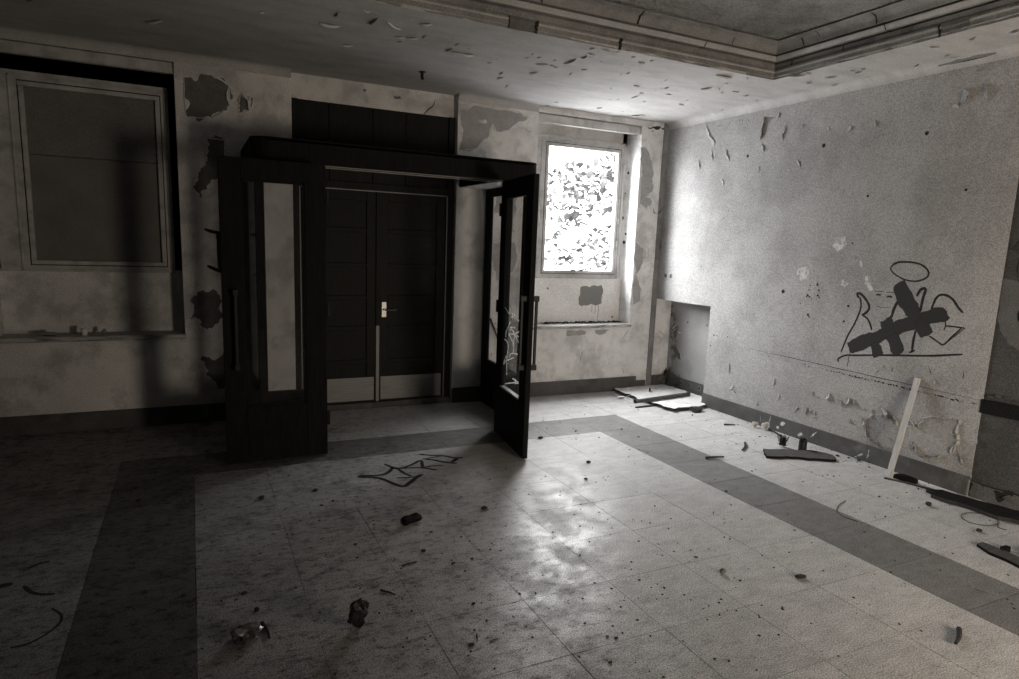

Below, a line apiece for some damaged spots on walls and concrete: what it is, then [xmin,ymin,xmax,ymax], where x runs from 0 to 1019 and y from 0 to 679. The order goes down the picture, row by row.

peeling [527,48,654,76]
peeling [183,74,254,122]
peeling [459,105,533,152]
peeling [192,135,226,199]
peeling [190,289,222,329]
peeling [997,240,1019,351]
peeling [811,392,899,449]
spalling [968,470,1019,512]